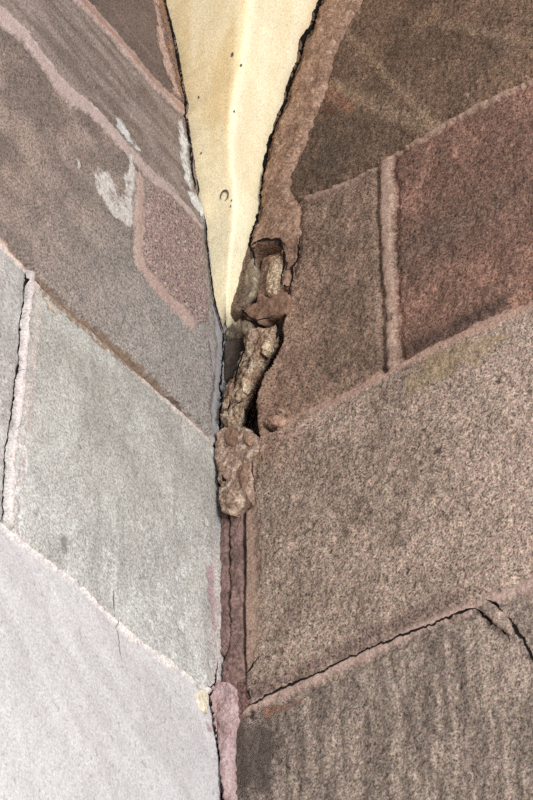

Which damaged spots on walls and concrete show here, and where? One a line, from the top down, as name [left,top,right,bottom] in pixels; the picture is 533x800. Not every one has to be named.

water stain [94,118,141,227]
crack [163,0,200,196]
water stain [178,121,204,216]
crack [248,0,322,294]
crack [0,272,44,522]
crack [81,313,187,417]
spalling [214,252,295,517]
crack [241,309,289,340]
crack [206,513,533,800]